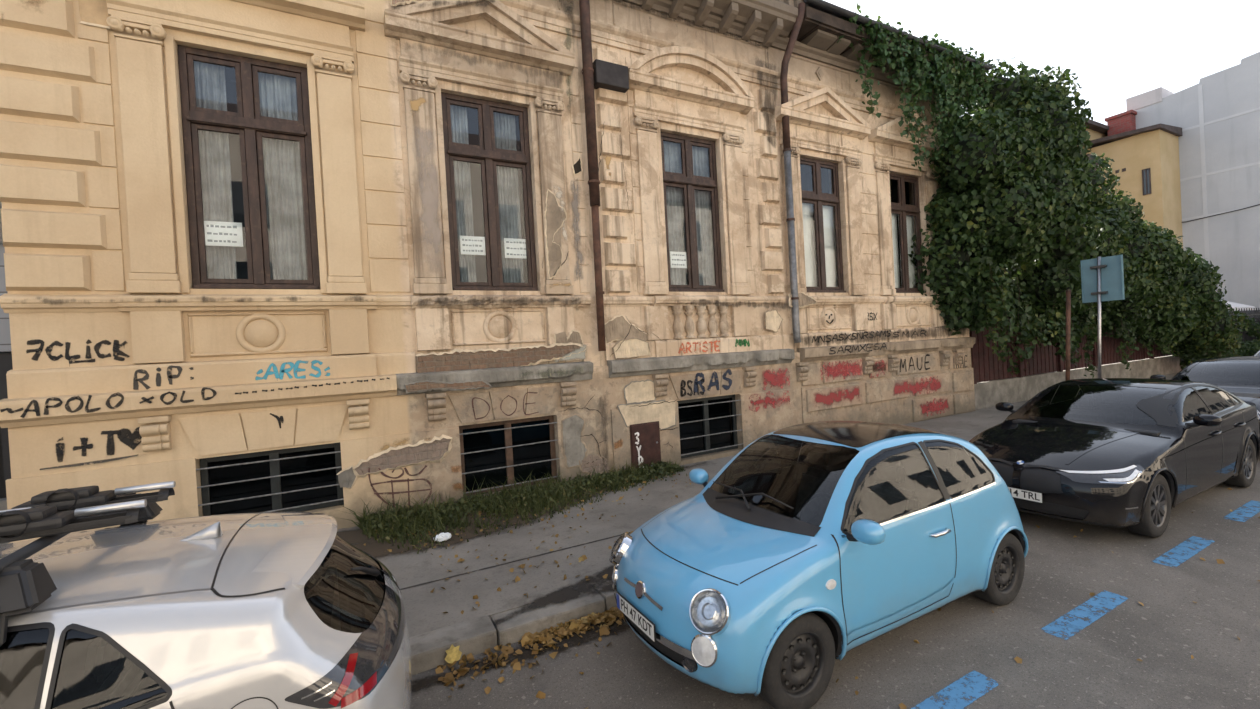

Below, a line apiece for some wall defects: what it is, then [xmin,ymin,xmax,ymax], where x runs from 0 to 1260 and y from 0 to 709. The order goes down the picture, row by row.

peeling [545,189,567,279]
spalling [605,315,656,343]
spalling [404,330,586,394]
peeling [617,379,677,430]
spalling [336,435,452,489]